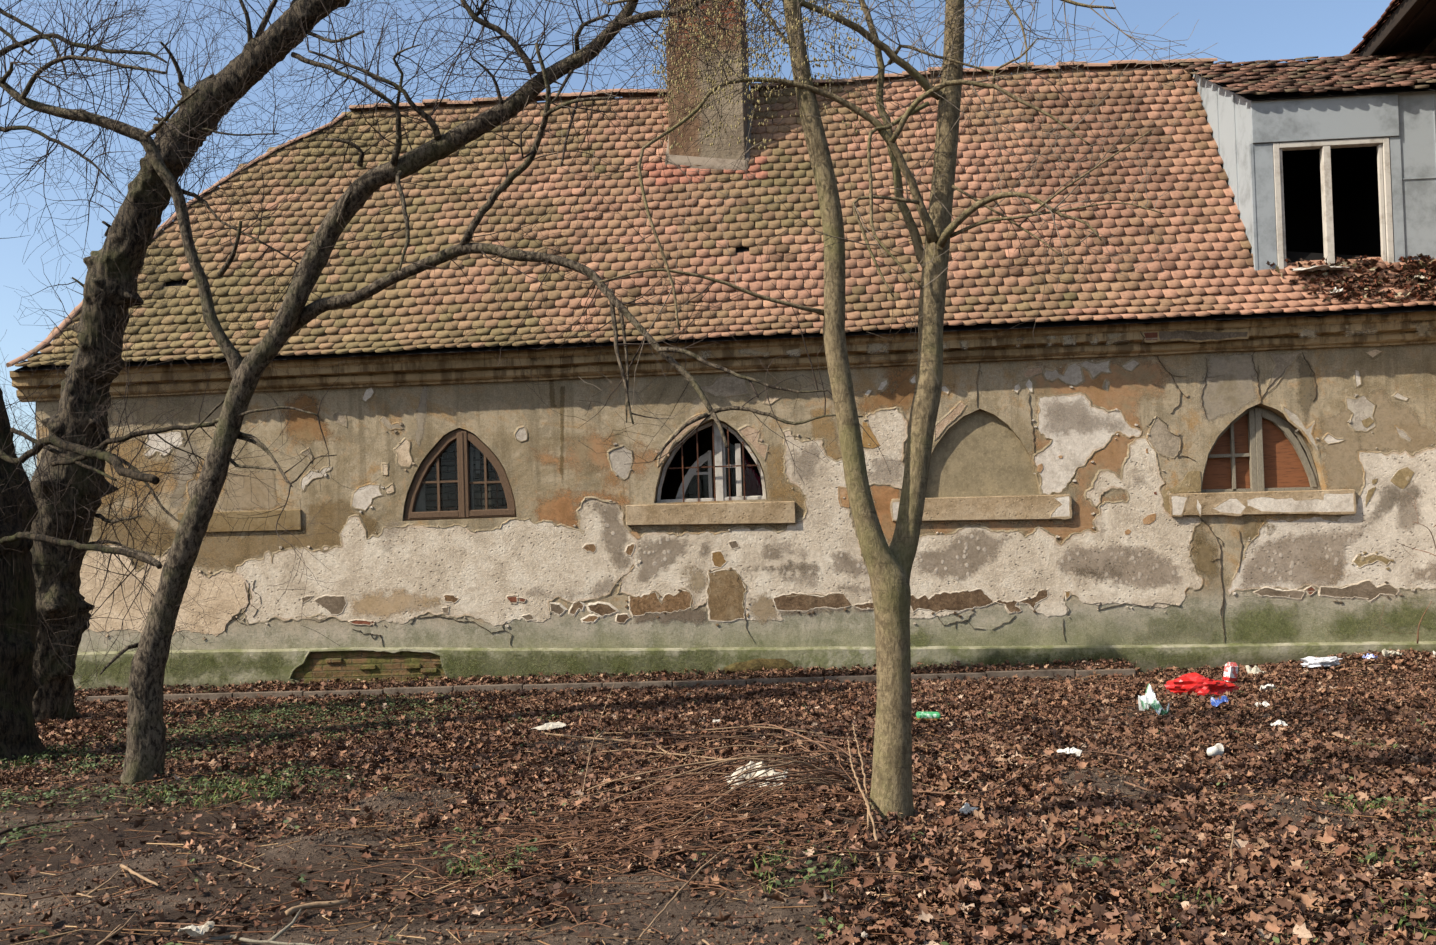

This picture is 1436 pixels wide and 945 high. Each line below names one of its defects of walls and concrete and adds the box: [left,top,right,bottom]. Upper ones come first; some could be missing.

peeling [79,543,171,637]
spalling [288,648,448,685]
peeling [173,411,874,640]
water stain [750,594,864,623]
peeling [863,378,909,521]
peeling [910,348,1436,624]
crack [1140,331,1221,460]
crack [1252,351,1317,403]